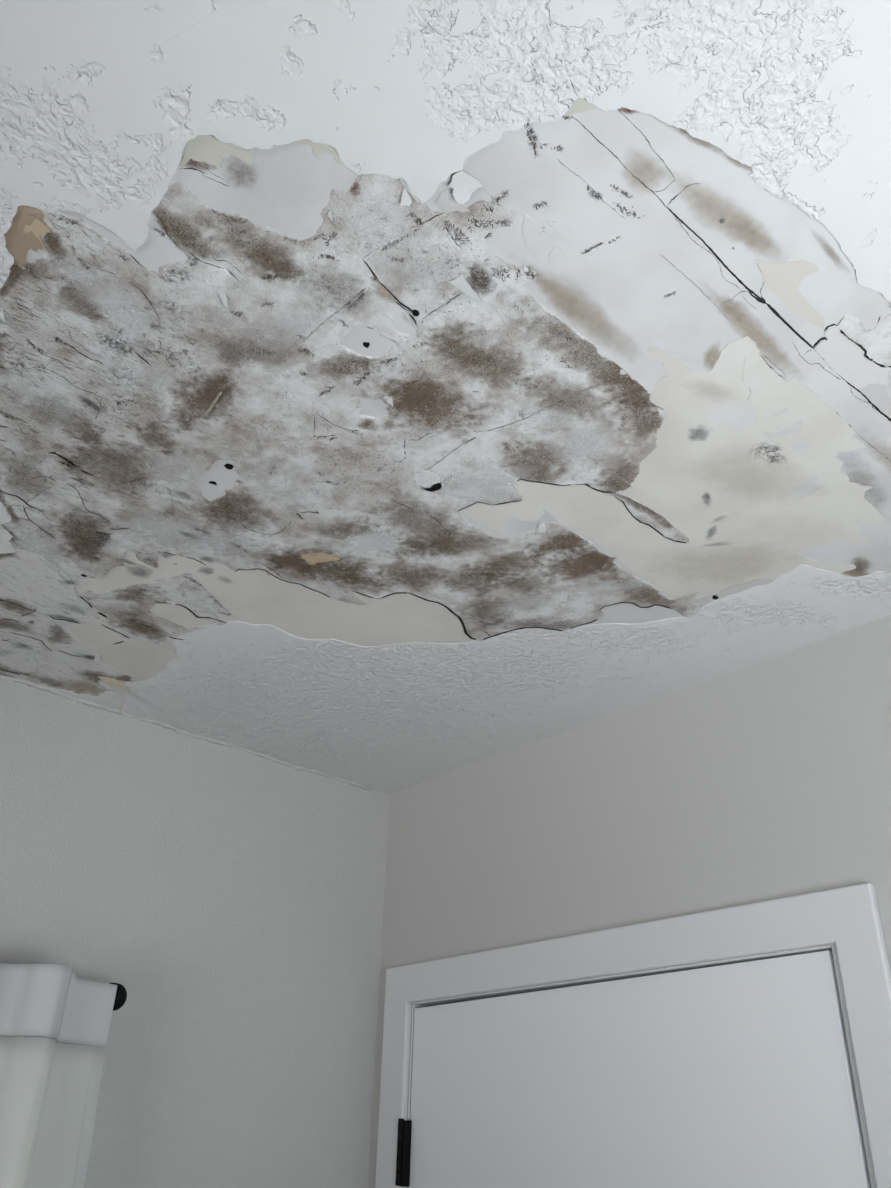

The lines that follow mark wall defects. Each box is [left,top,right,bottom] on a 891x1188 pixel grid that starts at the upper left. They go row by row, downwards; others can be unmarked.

crack [307,212,469,338]
crack [570,80,891,462]
damp [179,377,231,427]
damp [361,380,475,430]
peeling [0,97,891,697]
damp [535,319,661,434]
crack [0,452,129,539]
damp [604,466,672,526]
crack [0,596,227,657]
damp [269,552,380,587]
crack [234,562,669,641]
damp [452,533,665,606]